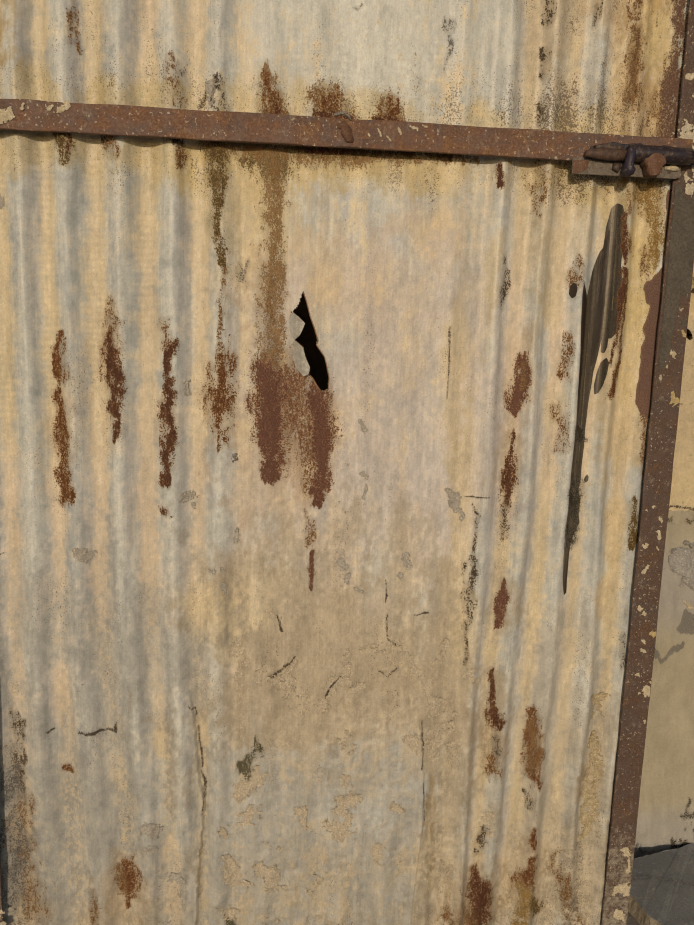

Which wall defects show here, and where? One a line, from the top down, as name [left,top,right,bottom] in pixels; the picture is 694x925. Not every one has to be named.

rust [303,78,416,121]
rust [622,0,689,138]
rust [49,329,76,508]
rust [99,296,128,445]
rust [157,317,180,488]
rust [199,140,480,591]
rust [498,351,532,540]
water stain [563,203,627,595]
peeling [217,766,268,840]
peeling [320,774,363,843]
rust [481,667,506,784]
rust [520,704,546,811]